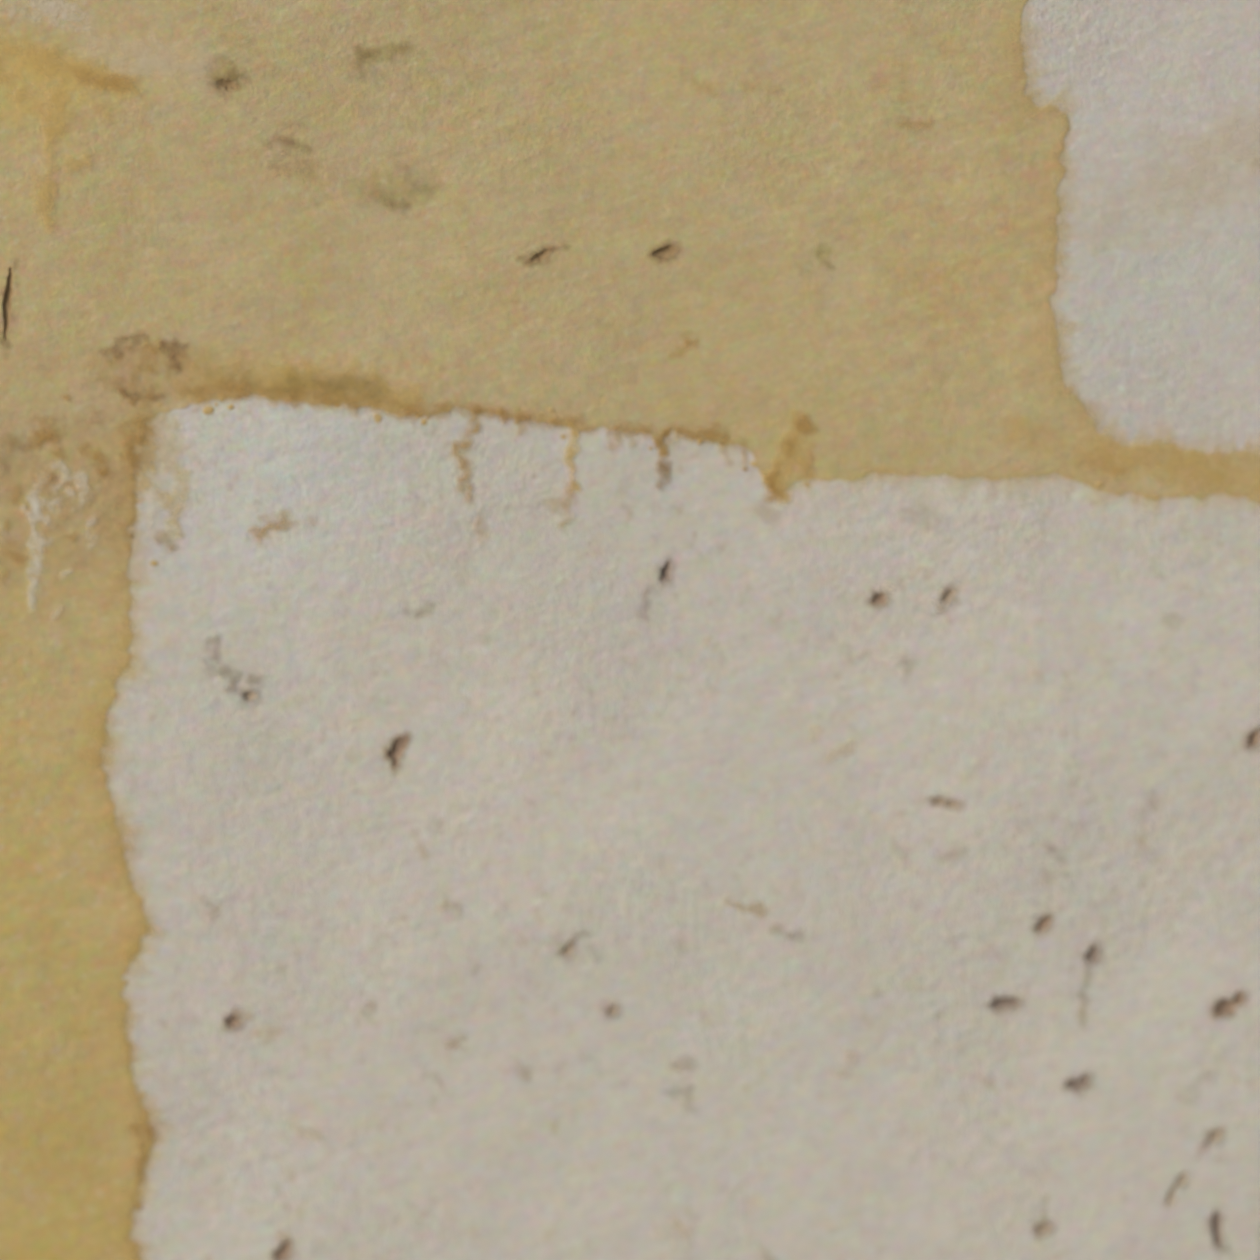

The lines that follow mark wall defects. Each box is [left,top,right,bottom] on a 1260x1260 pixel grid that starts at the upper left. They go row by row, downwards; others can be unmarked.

water stain [196,363,420,412]
peeling [1018,0,1260,458]
peeling [95,392,1260,1260]